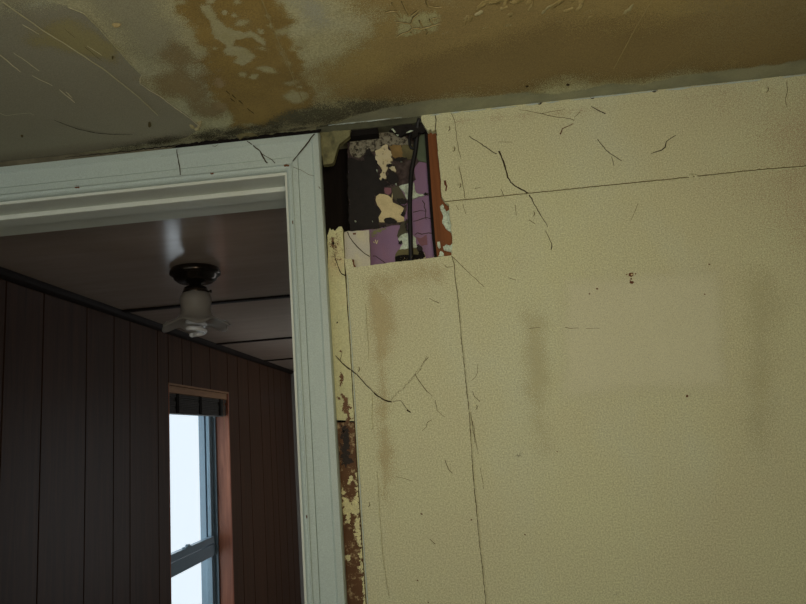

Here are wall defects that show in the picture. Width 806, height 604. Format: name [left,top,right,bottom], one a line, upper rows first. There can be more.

leakage [0,0,806,150]
crack [65,129,321,176]
spalling [322,132,427,259]
flaking render [440,204,451,233]
crack [413,113,806,250]
crack [334,232,411,604]
crack [444,256,486,604]
peeling [341,473,366,604]